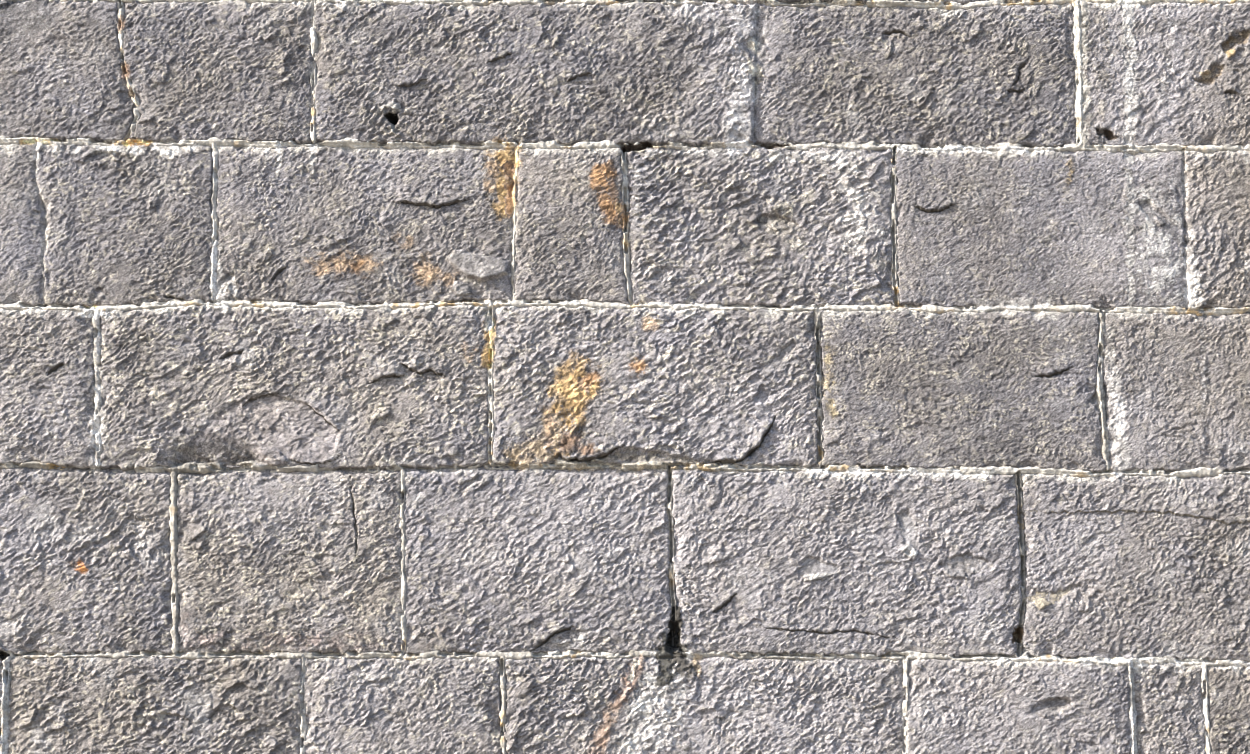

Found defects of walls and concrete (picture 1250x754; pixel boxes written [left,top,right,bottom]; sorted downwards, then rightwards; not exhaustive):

rust [480,131,525,225]
rust [585,155,632,230]
spalling [174,396,340,470]
rust [499,345,607,477]